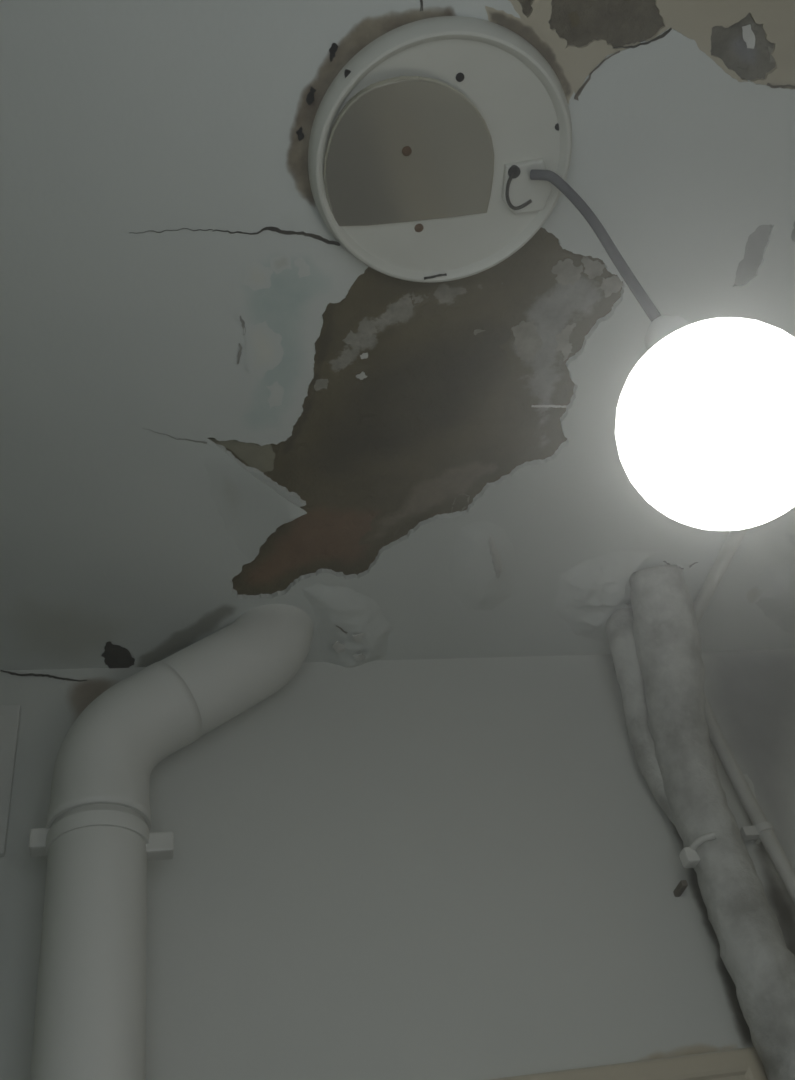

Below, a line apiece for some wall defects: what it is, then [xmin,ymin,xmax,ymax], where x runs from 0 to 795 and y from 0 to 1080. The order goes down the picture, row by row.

peeling [485,0,795,104]
crack [131,227,340,246]
spalling [733,224,772,286]
spalling [208,227,623,595]